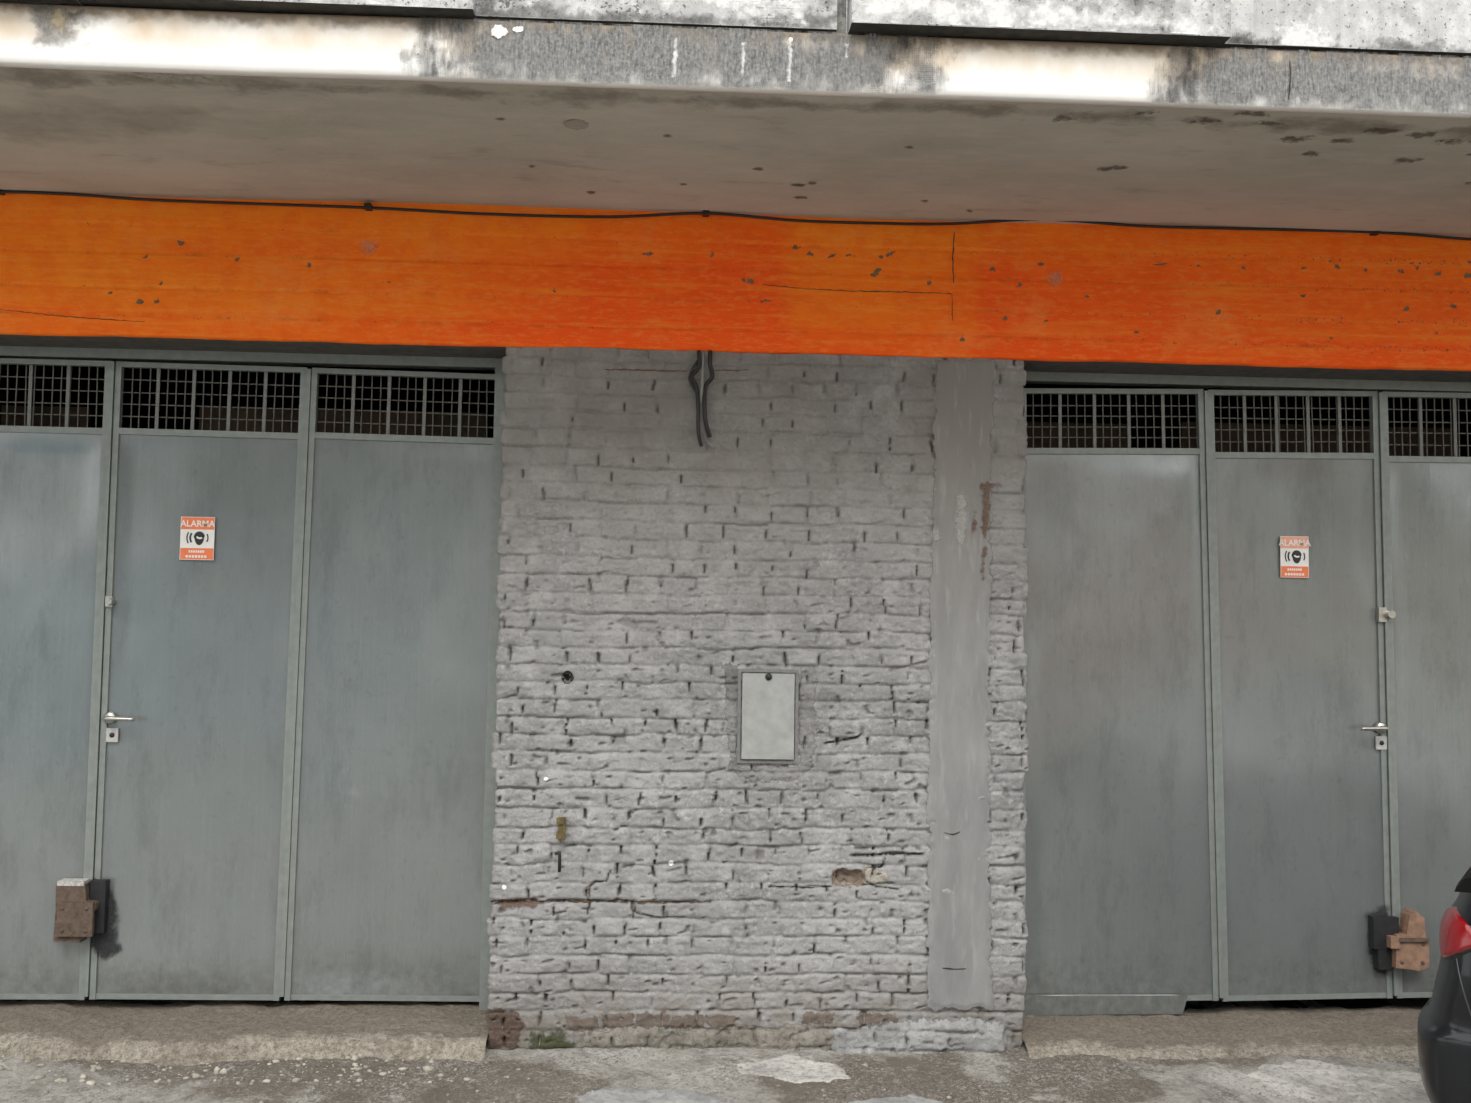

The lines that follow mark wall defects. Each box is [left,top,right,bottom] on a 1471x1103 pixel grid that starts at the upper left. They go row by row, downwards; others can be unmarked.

water stain [415,0,1471,155]
corrosion [972,482,1001,580]
spalling [832,866,888,888]